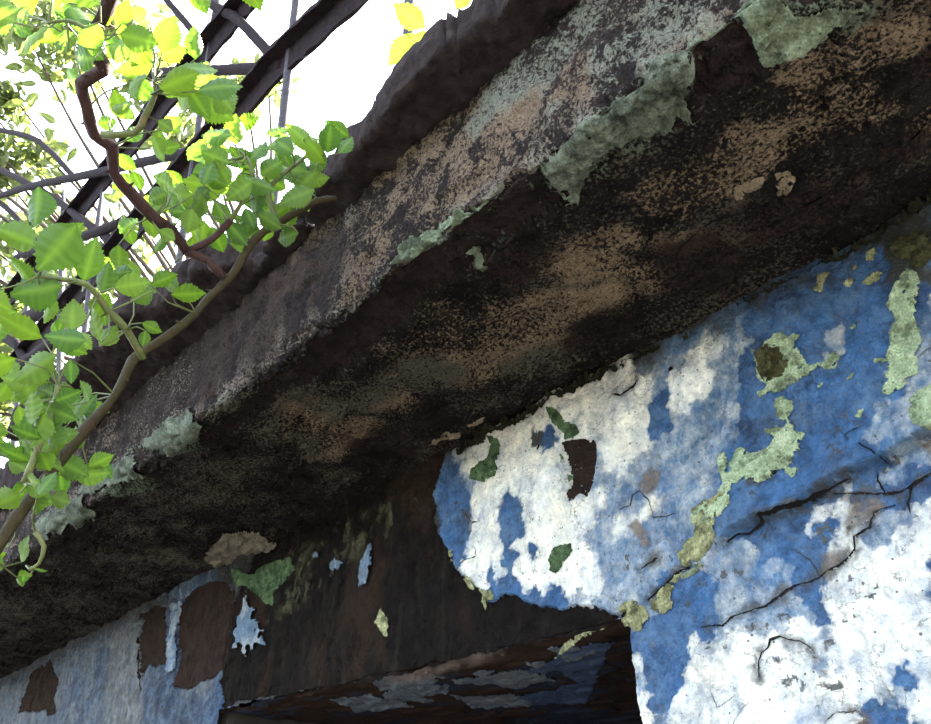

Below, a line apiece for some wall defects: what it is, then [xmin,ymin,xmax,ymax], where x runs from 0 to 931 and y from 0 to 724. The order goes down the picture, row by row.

peeling [775,171,796,197]
crack [601,377,645,396]
spalling [562,438,597,501]
crack [621,490,675,518]
damp [161,571,216,601]
spalling [172,453,626,713]
crack [625,552,744,613]
crack [703,427,931,693]
spalling [138,605,167,676]
spalling [18,659,59,715]